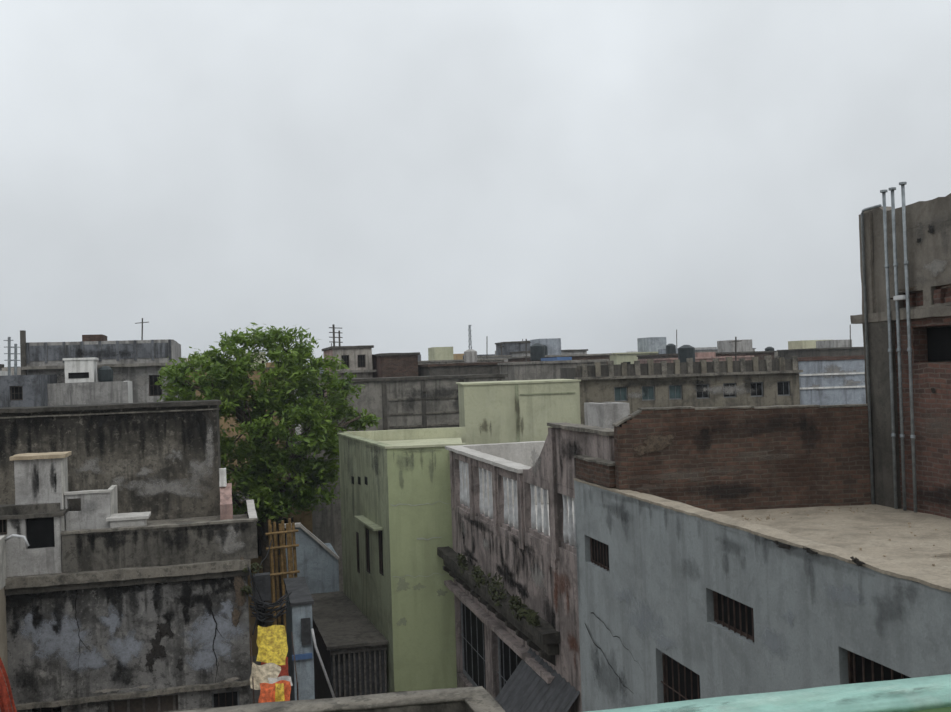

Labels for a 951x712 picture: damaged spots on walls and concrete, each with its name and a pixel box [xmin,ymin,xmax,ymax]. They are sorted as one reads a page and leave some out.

water stain [33,465,56,497]
water stain [83,412,214,497]
peeling [18,576,247,672]
crack [210,608,223,683]
crack [585,612,639,694]